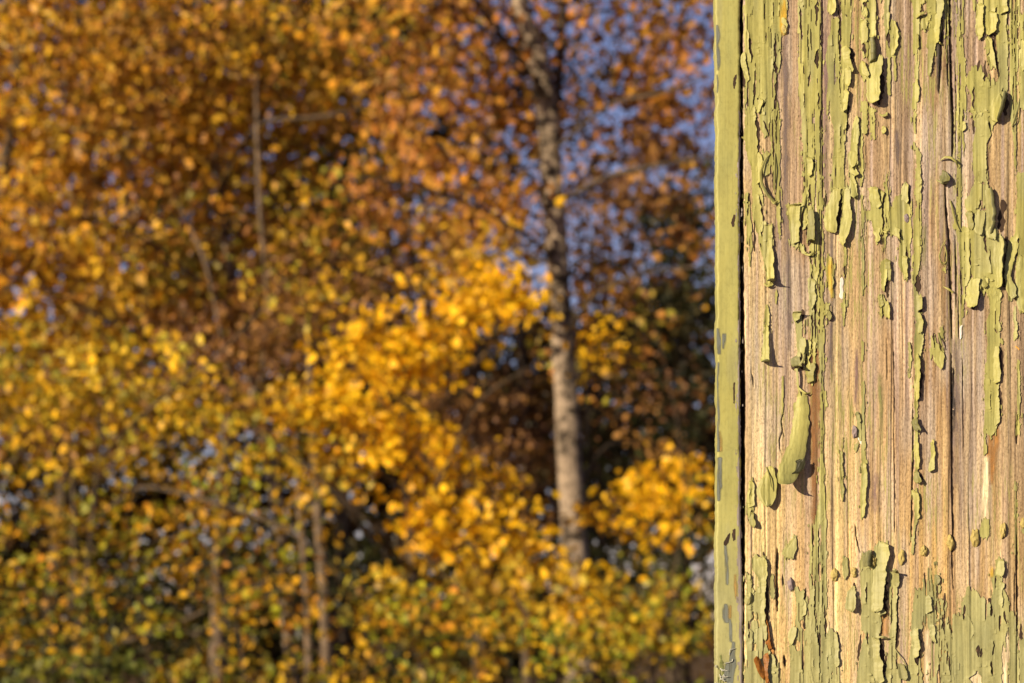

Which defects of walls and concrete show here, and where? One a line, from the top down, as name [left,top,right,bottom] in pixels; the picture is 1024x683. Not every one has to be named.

peeling [716,0,1024,683]